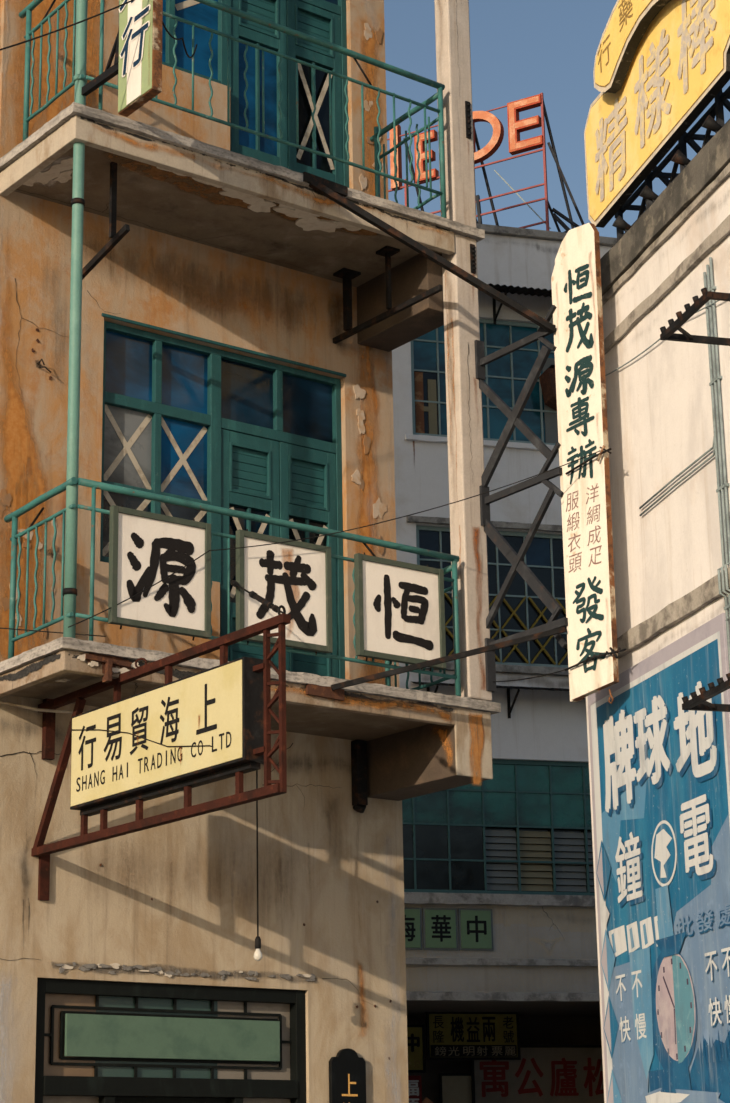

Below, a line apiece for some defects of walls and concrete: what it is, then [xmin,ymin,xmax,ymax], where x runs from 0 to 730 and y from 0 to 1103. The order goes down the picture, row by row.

peeling [107,153,378,236]
peeling [359,162,387,190]
crack [15,278,66,403]
peeling [353,384,371,454]
peeling [373,498,387,519]
crack [0,751,59,792]
rust [469,715,484,785]
peeling [52,962,317,983]